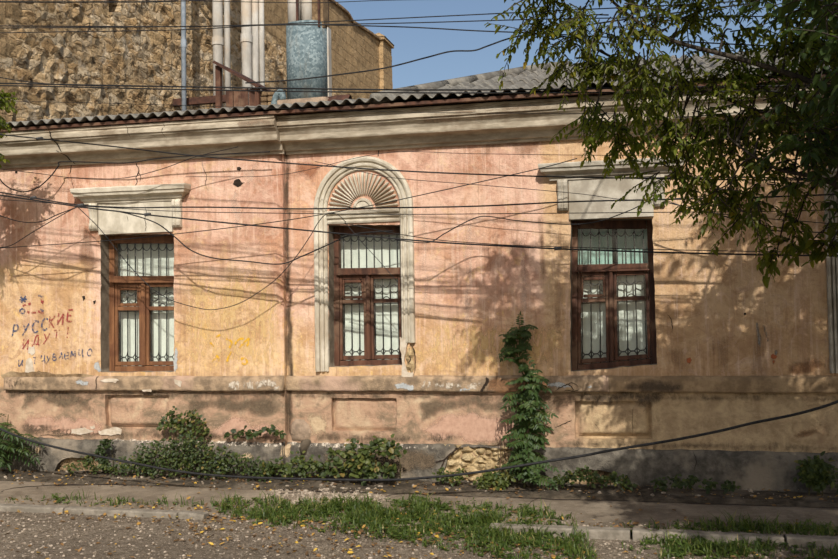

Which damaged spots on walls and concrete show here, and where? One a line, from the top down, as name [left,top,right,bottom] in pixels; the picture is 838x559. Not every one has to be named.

crack [49,131,75,204]
water stain [284,155,293,376]
peeling [395,321,571,393]
water stain [791,361,821,373]
water stain [8,380,94,409]
peeling [229,380,279,390]
water stain [581,382,680,405]
water stain [24,424,71,435]
peeling [25,417,122,436]
water stain [190,391,297,447]